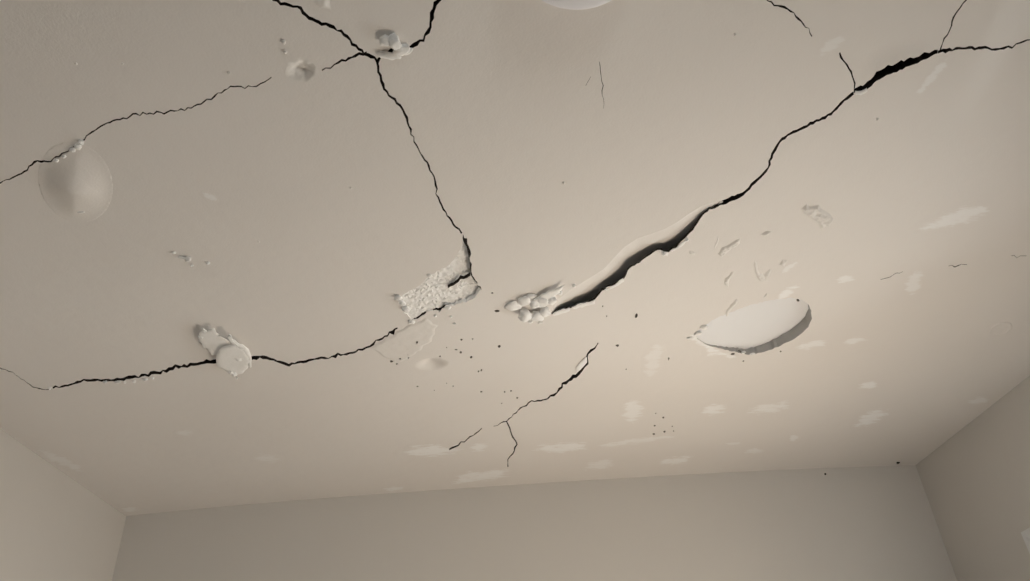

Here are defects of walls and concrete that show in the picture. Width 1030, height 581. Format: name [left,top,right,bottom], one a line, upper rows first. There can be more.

crack [0,77,271,184]
crack [273,0,462,234]
crack [551,0,1030,314]
spalling [396,235,493,320]
crack [0,359,216,390]
crack [252,328,398,366]
crack [449,343,598,467]